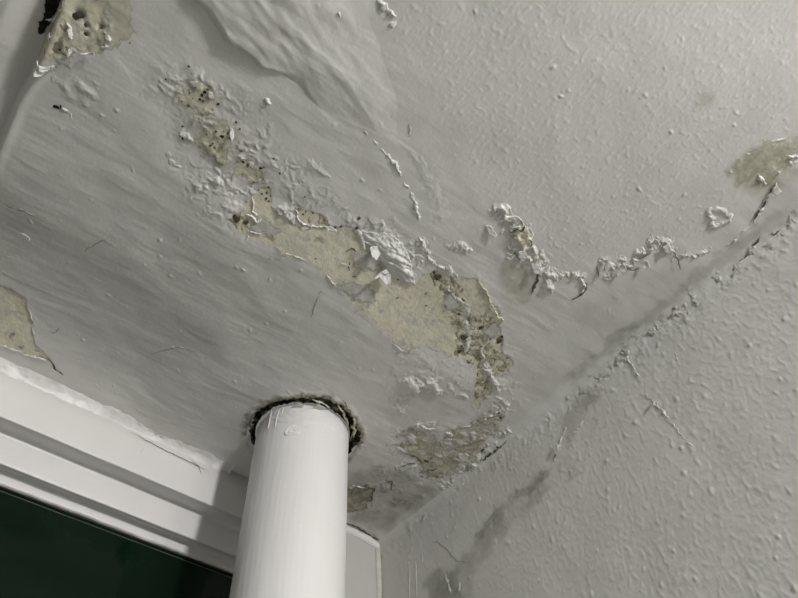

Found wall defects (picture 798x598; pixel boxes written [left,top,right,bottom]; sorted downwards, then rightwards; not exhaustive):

peeling [33,0,133,78]
peeling [376,0,397,28]
peeling [176,82,220,118]
peeling [730,138,798,185]
peeling [486,203,587,301]
peeling [596,232,714,281]
crack [725,181,781,263]
spalling [711,209,798,290]
peeling [0,286,63,375]
peeling [179,120,514,478]
peeling [347,484,375,512]